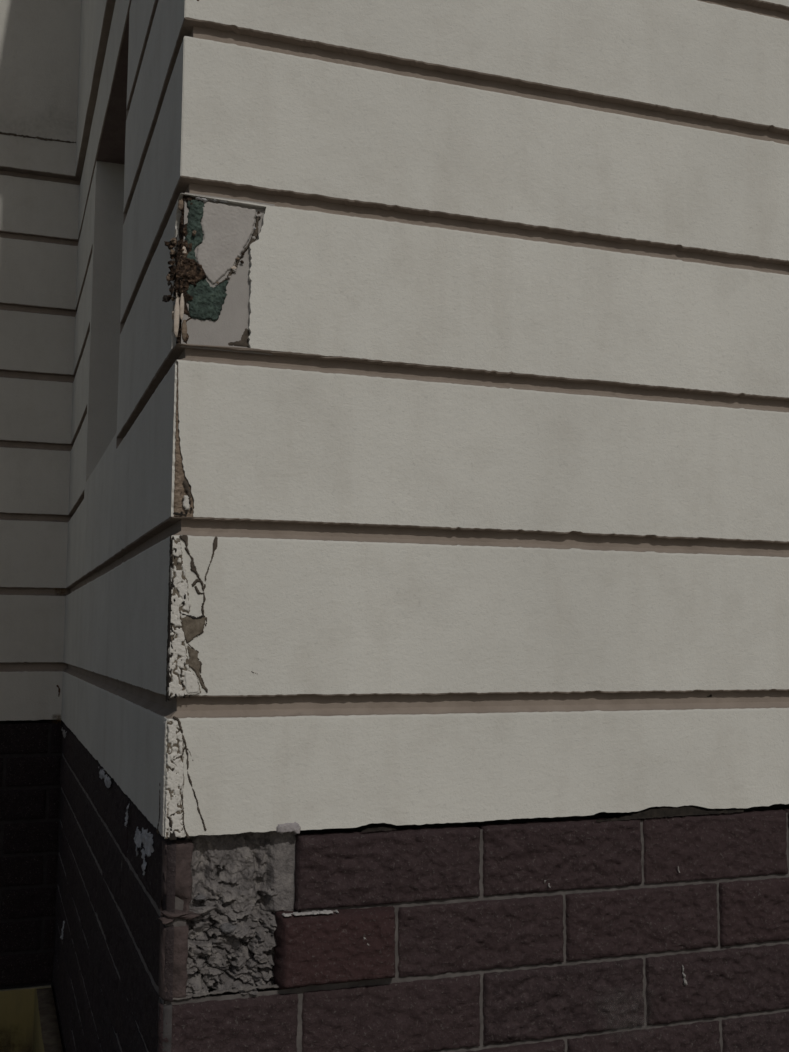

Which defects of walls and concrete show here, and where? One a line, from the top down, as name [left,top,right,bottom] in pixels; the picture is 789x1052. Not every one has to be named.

spalling [162,192,275,355]
spalling [173,362,194,517]
peeling [166,535,208,702]
crack [179,535,218,619]
crack [173,716,207,839]
spalling [157,720,297,1001]